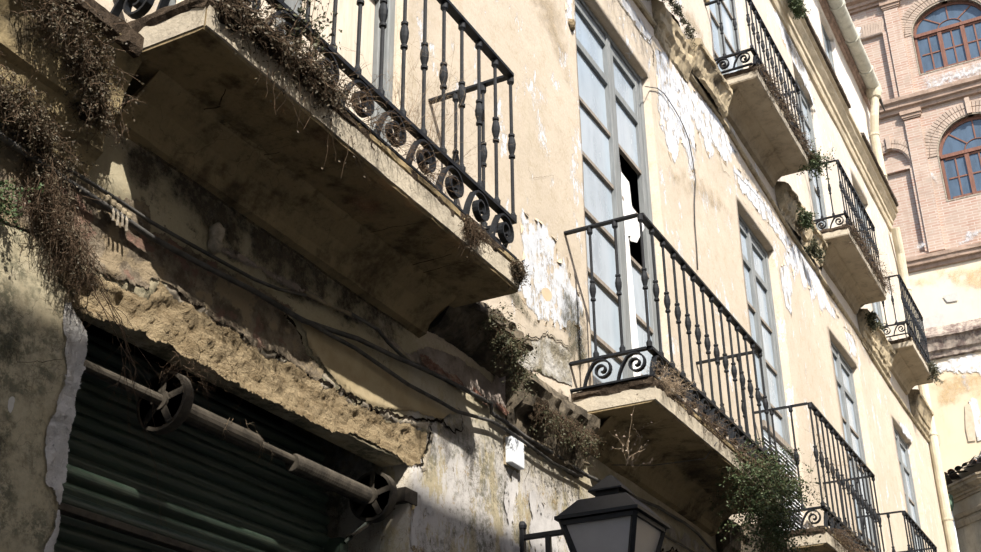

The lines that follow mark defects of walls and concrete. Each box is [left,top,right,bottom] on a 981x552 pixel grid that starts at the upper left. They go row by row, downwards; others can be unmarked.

peeling [565,0,576,30]
peeling [619,0,839,319]
peeling [518,208,584,332]
spalling [0,140,460,552]
crack [166,283,463,472]
spalling [386,336,509,415]
spalling [518,338,573,385]